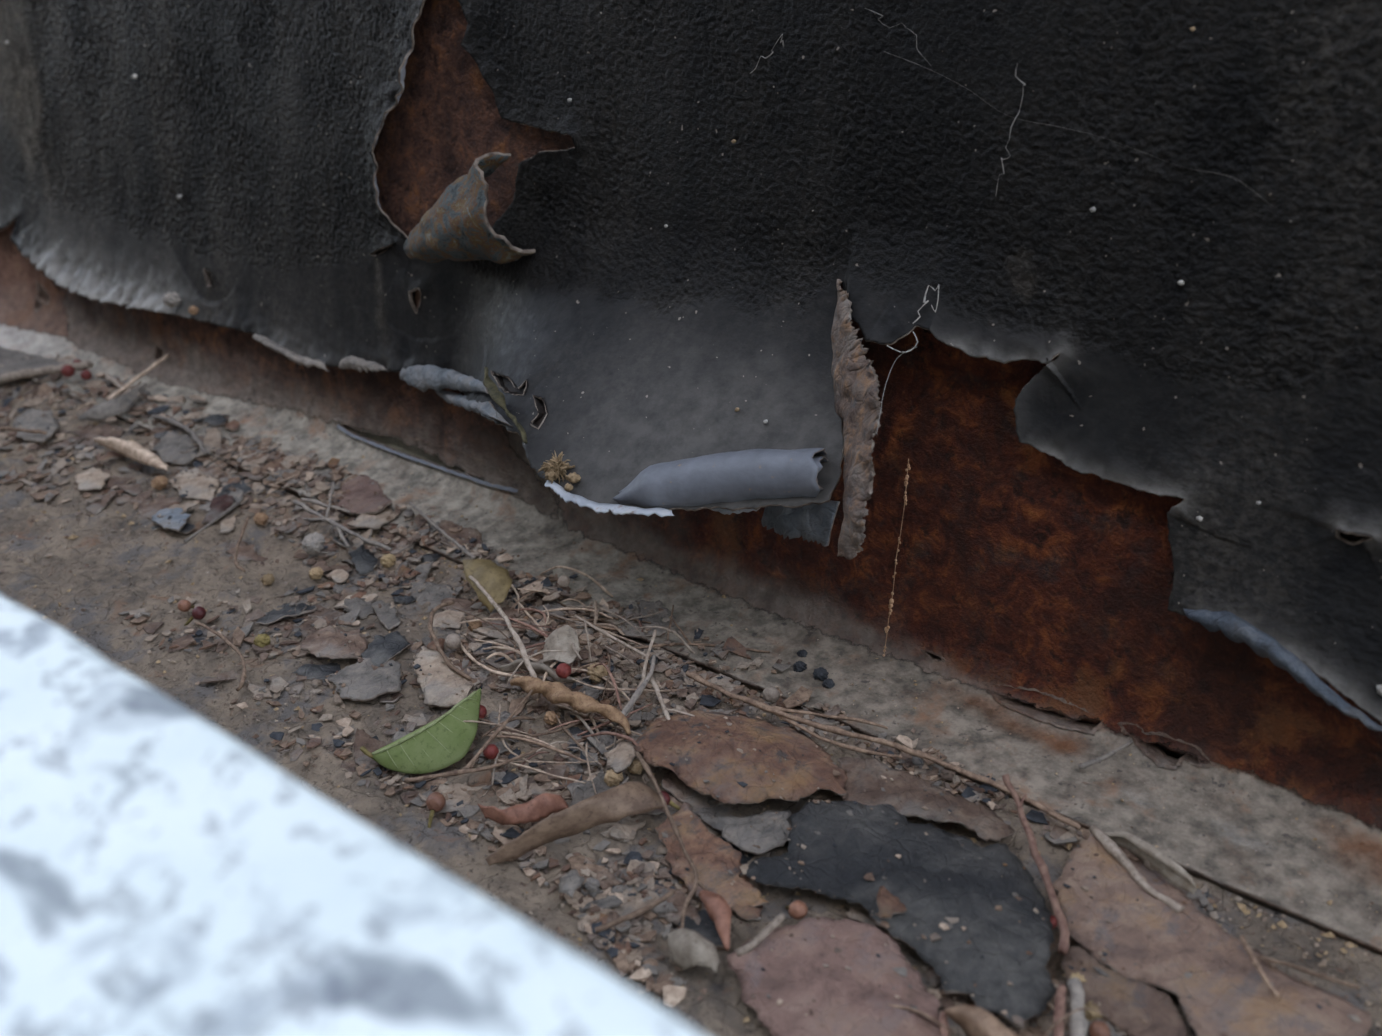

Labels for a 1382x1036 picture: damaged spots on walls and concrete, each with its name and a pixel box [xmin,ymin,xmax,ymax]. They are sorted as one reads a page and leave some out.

peeling [369,0,575,264]
rust [0,220,1382,861]
peeling [544,279,883,560]
peeling [1183,608,1382,731]